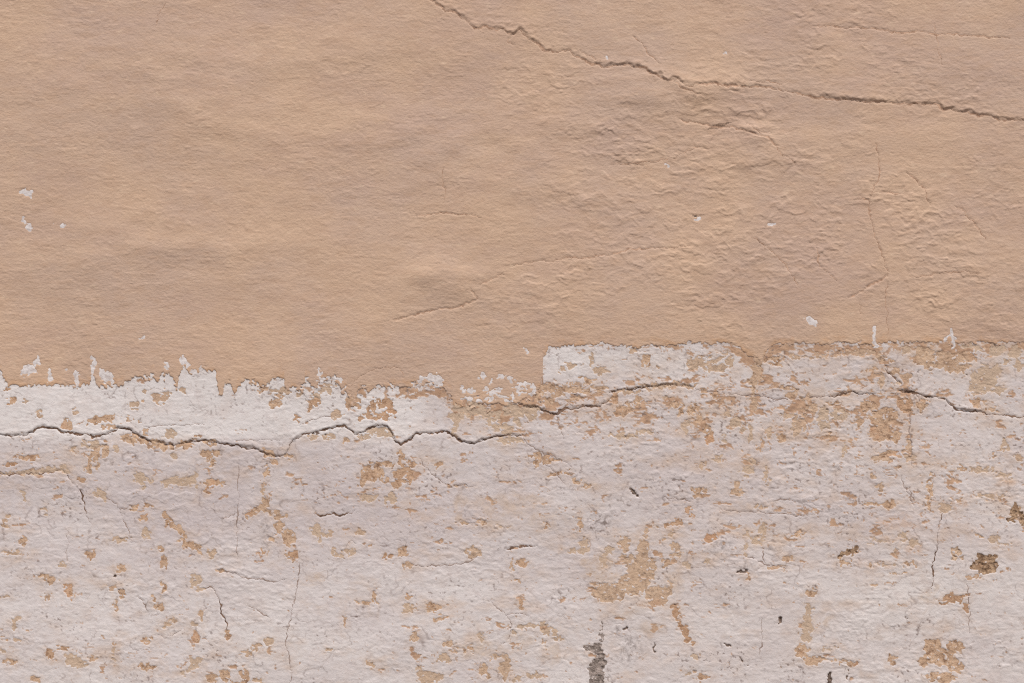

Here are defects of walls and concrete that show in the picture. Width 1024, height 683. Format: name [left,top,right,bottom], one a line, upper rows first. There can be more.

crack [431,0,1017,122]
peeling [0,355,226,503]
peeling [257,367,397,444]
peeling [357,449,418,505]
crack [0,145,1024,680]
peeling [448,326,1024,513]
peeling [954,437,1024,526]
peeling [112,503,225,629]
peeling [567,487,710,683]
peeling [794,587,858,683]
peeling [917,639,966,683]
spalling [951,533,1012,580]